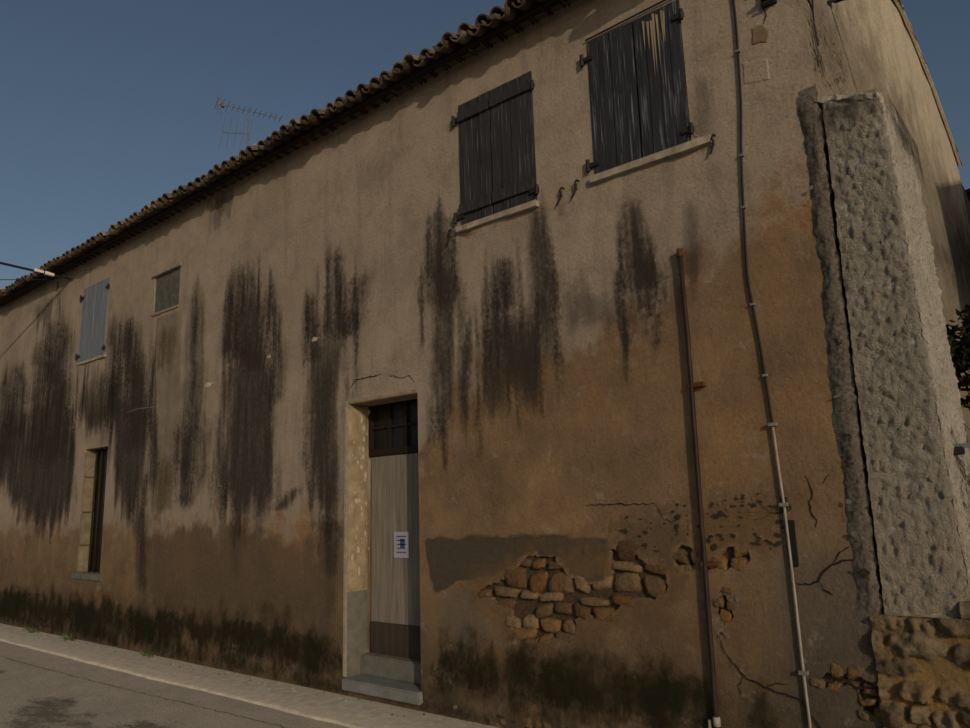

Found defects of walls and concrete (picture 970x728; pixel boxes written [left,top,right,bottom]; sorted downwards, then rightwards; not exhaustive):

leakage [427,208,557,430]
leakage [618,204,656,315]
leakage [0,322,158,586]
leakage [175,274,296,574]
leakage [305,251,366,572]
flaking render [478,493,789,645]
crack [754,475,828,528]
crack [797,546,854,595]
crack [718,635,821,728]